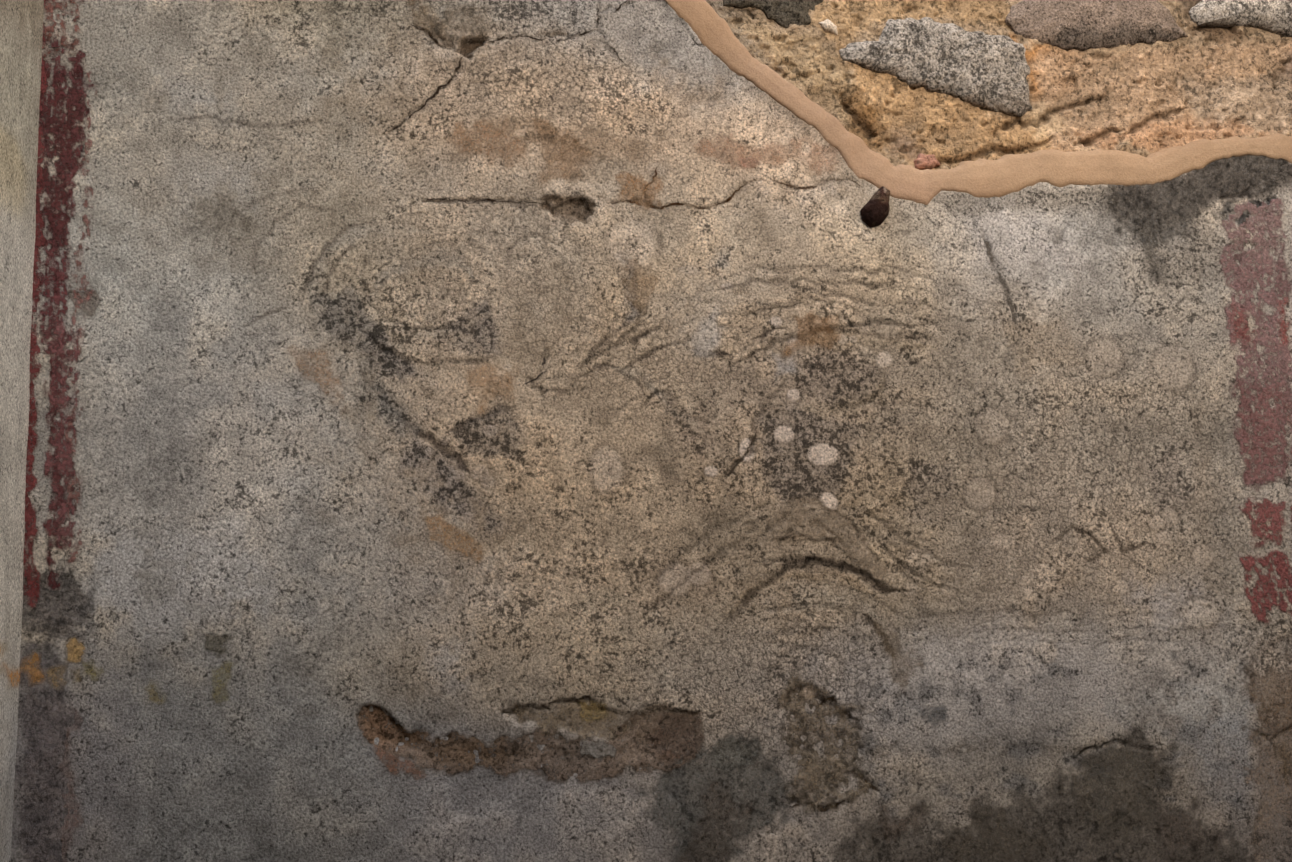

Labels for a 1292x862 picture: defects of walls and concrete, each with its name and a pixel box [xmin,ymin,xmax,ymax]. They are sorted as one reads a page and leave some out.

crack [383,0,628,134]
crack [422,197,544,205]
crack [598,167,859,209]
spalling [357,702,705,783]
damp [641,736,789,862]
spalling [778,675,872,811]
damp [837,727,1255,862]